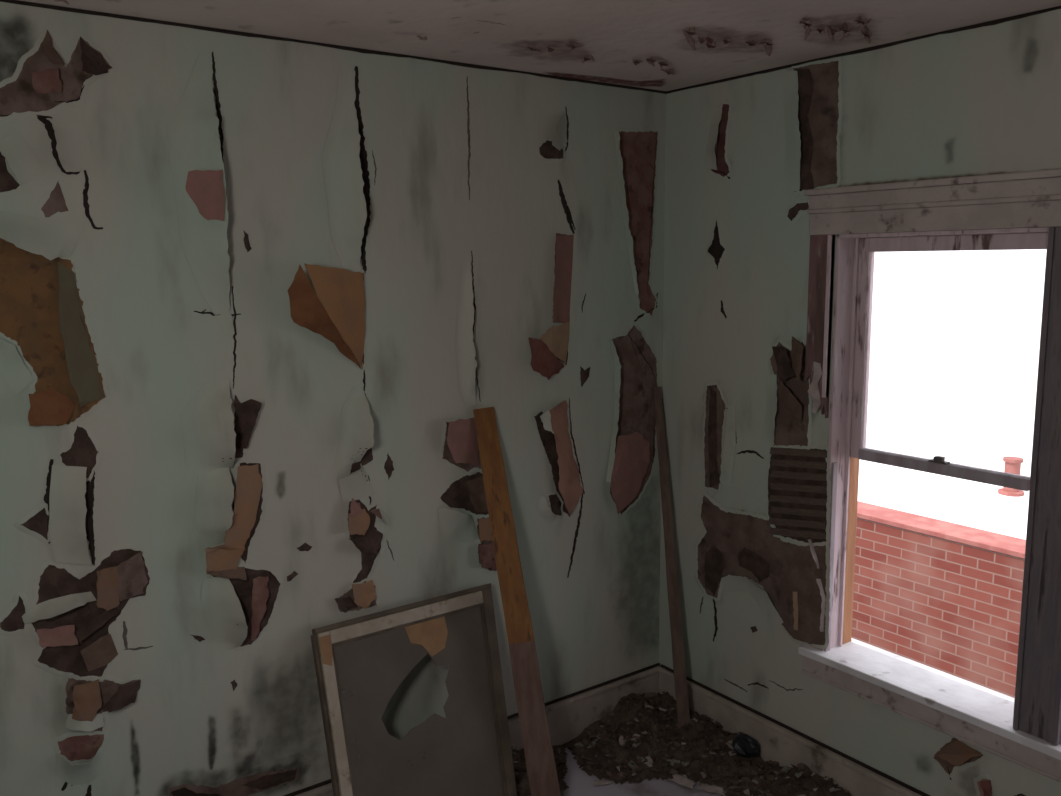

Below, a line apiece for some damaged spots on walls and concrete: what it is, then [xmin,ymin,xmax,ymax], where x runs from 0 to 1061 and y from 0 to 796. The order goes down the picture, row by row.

flaking render [0,37,112,117]
crack [0,0,1061,200]
flaking render [619,131,658,316]
flaking render [784,61,839,225]
flaking render [0,238,106,478]
flaking render [212,395,298,647]
flaking render [534,411,570,517]
flaking render [610,325,657,514]
flaking render [697,341,831,645]
flaking render [32,549,150,714]
flaking render [58,727,104,761]
spalling [164,767,302,796]